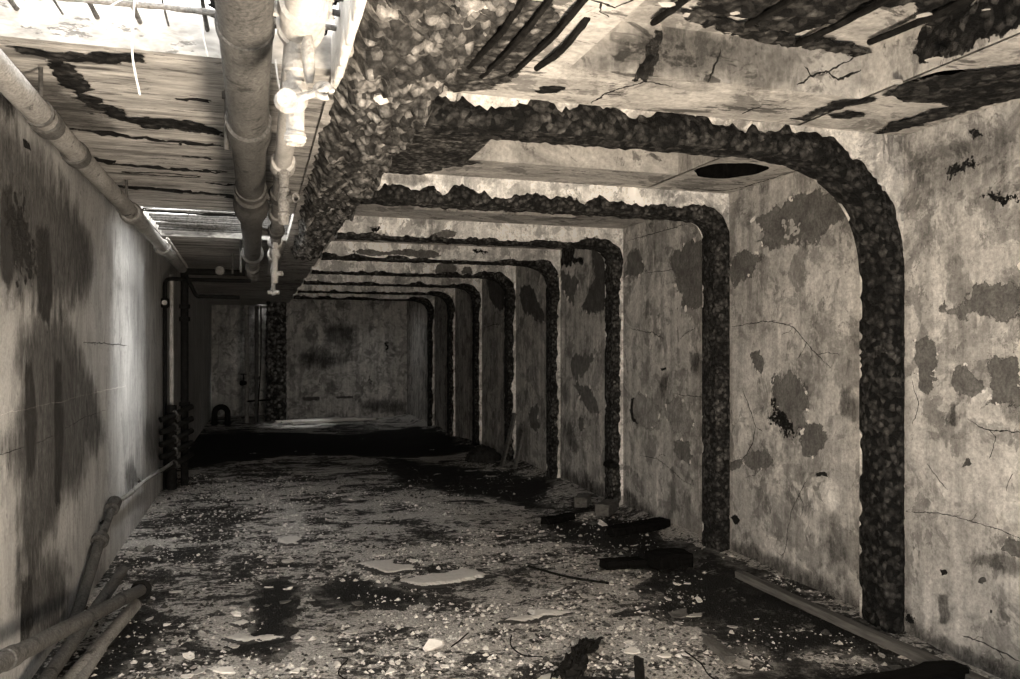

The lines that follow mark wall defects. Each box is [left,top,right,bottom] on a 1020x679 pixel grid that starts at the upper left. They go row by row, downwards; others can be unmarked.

crack [797,57,861,85]
damp [0,93,13,116]
damp [29,80,113,129]
spalling [291,0,1020,634]
damp [0,128,102,641]
crack [968,419,1020,458]
crack [905,511,1019,538]